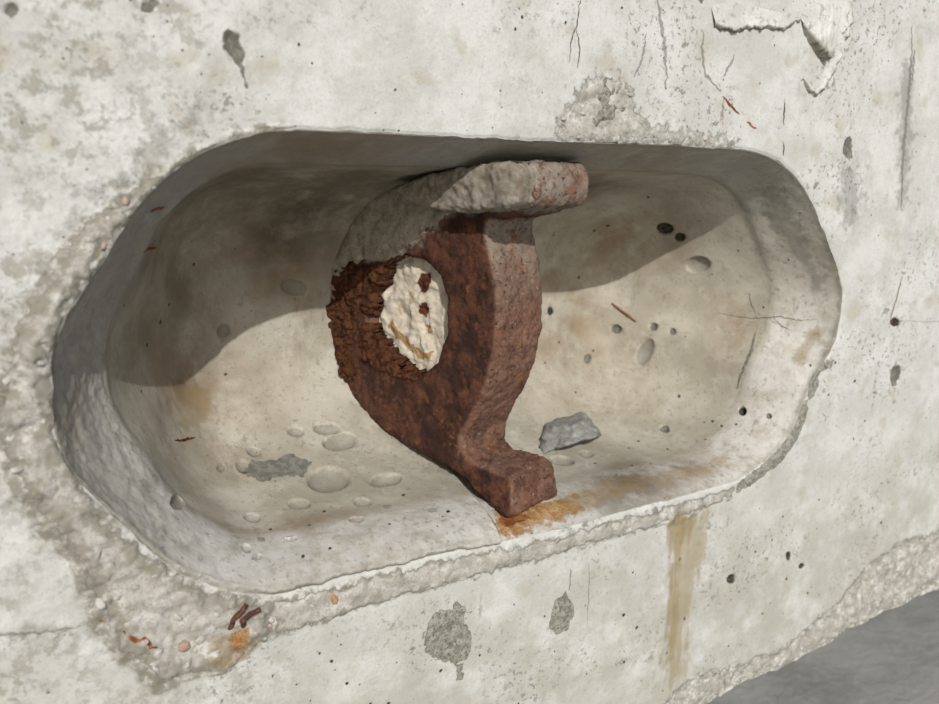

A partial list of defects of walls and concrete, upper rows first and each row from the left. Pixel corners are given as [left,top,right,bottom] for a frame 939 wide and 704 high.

crack [569,0,581,68]
spalling [555,69,739,147]
corrosion [388,321,434,359]
corrosion [417,272,433,333]
crack [721,293,816,389]
spalling [0,158,834,681]
corrosion [493,494,585,537]
spalling [665,531,939,704]